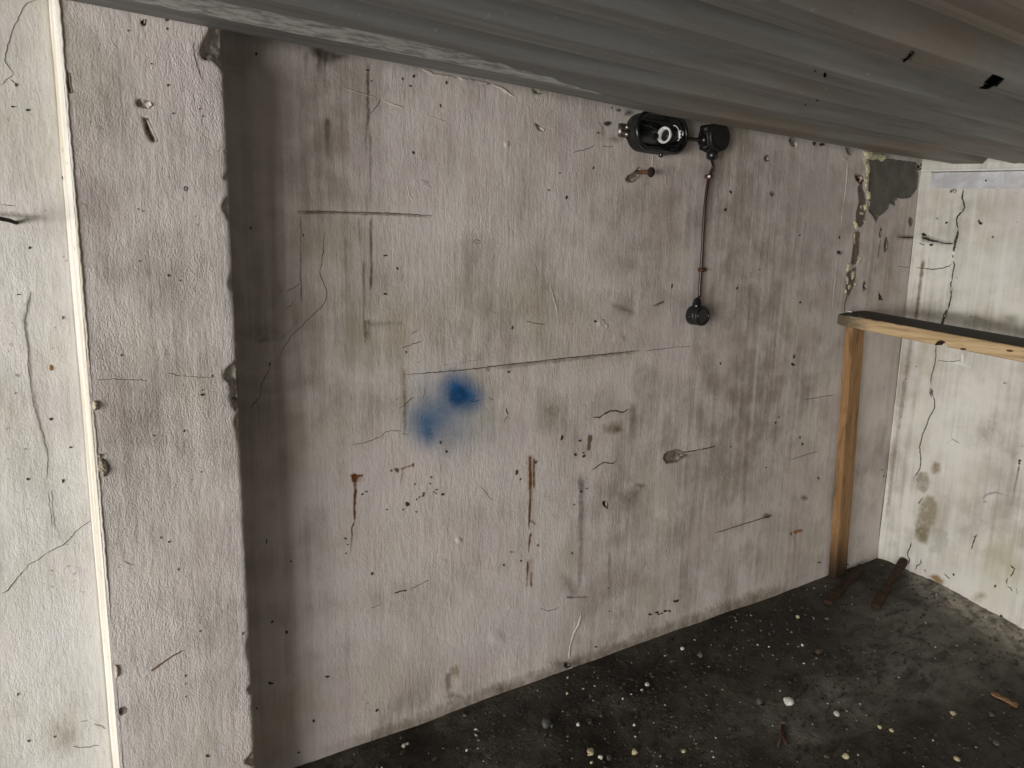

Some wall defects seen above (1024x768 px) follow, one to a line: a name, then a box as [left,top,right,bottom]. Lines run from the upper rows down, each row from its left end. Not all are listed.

crack [1,0,35,85]
peeling [832,147,922,308]
crack [23,297,48,478]
crack [250,232,327,408]
crack [898,189,966,504]
corrosion [351,474,363,534]
corrosion [528,457,539,549]
water stain [917,464,946,551]
crack [1,520,91,594]
crack [907,542,950,579]